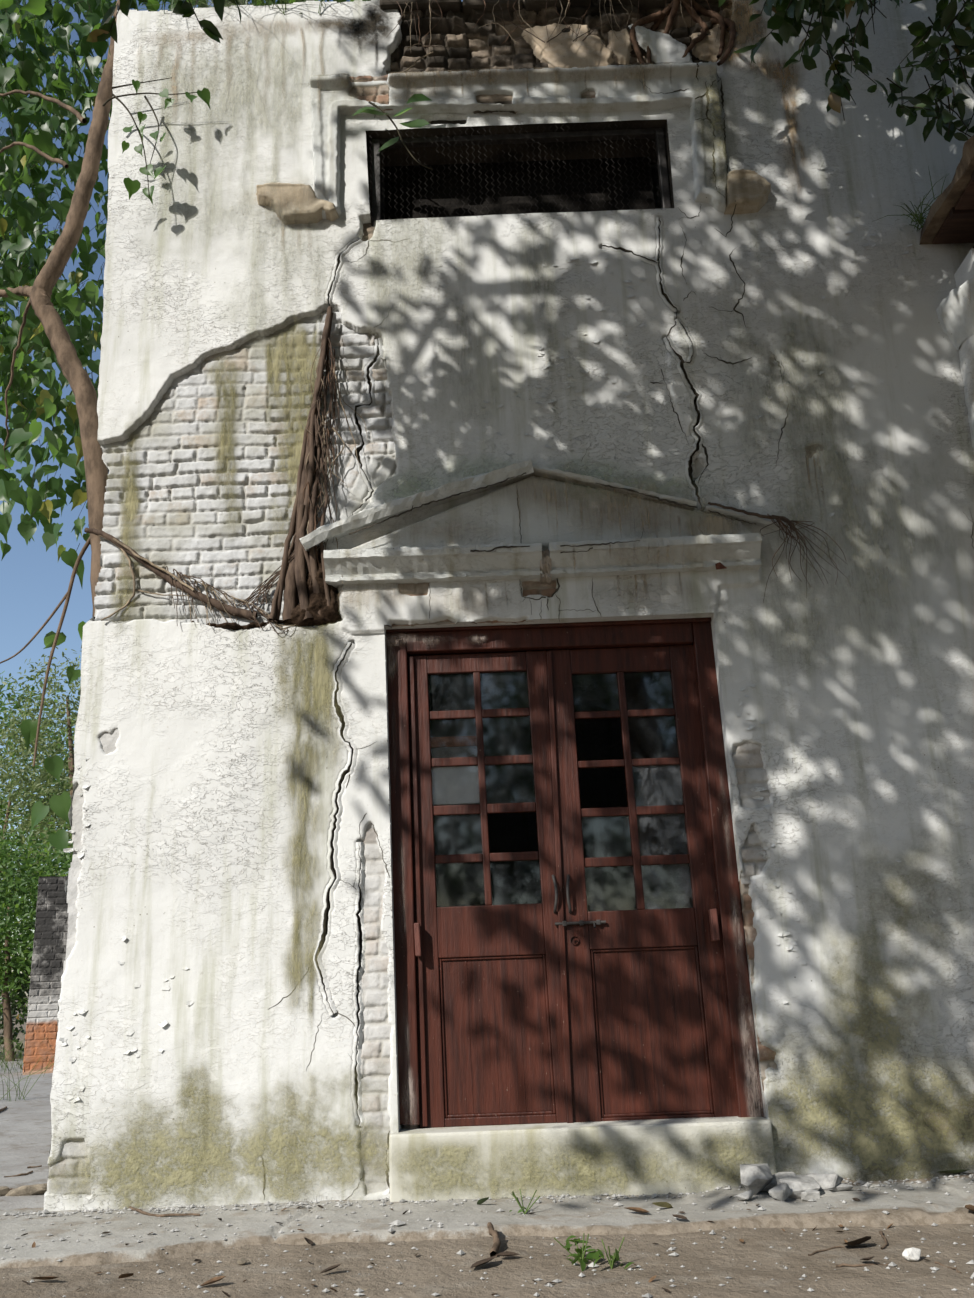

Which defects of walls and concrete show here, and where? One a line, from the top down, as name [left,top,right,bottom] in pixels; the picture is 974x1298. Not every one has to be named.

leakage [317,4,390,61]
spalling [349,0,733,111]
spalling [94,307,397,626]
crack [318,63,789,622]
crack [269,642,390,1200]
leakage [849,1160,974,1181]